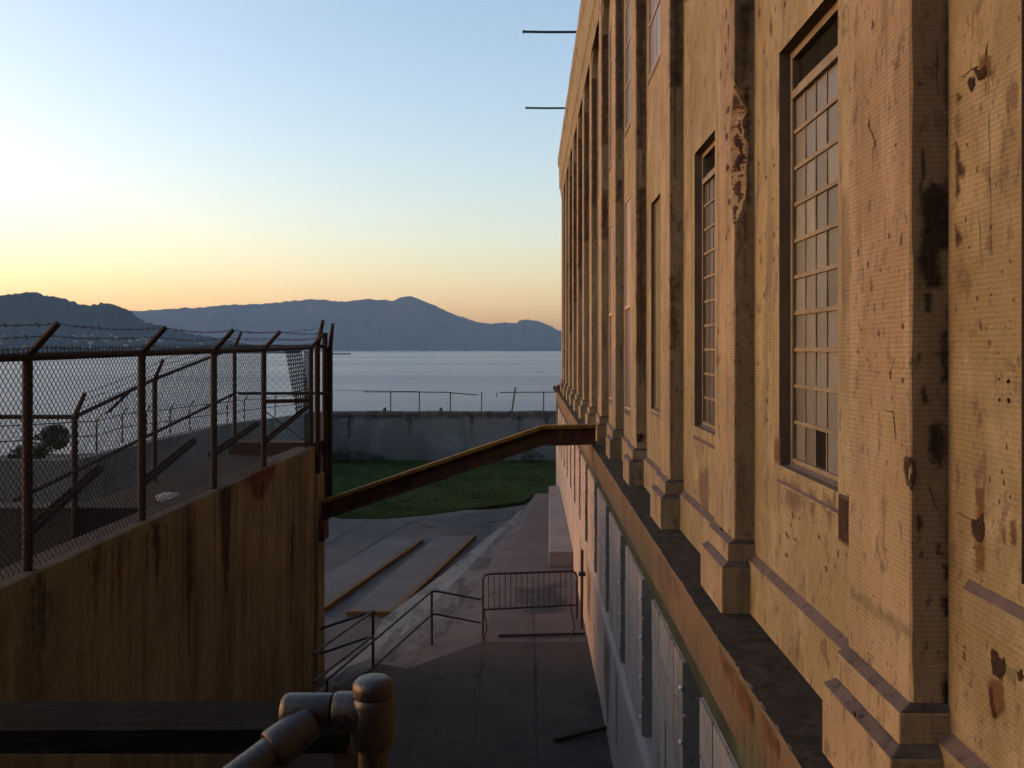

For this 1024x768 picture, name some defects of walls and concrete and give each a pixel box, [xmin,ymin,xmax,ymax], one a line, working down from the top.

spalling [957,57,990,101]
spalling [725,86,775,240]
damp [917,102,965,313]
spalling [903,456,917,490]
spalling [988,649,1023,719]